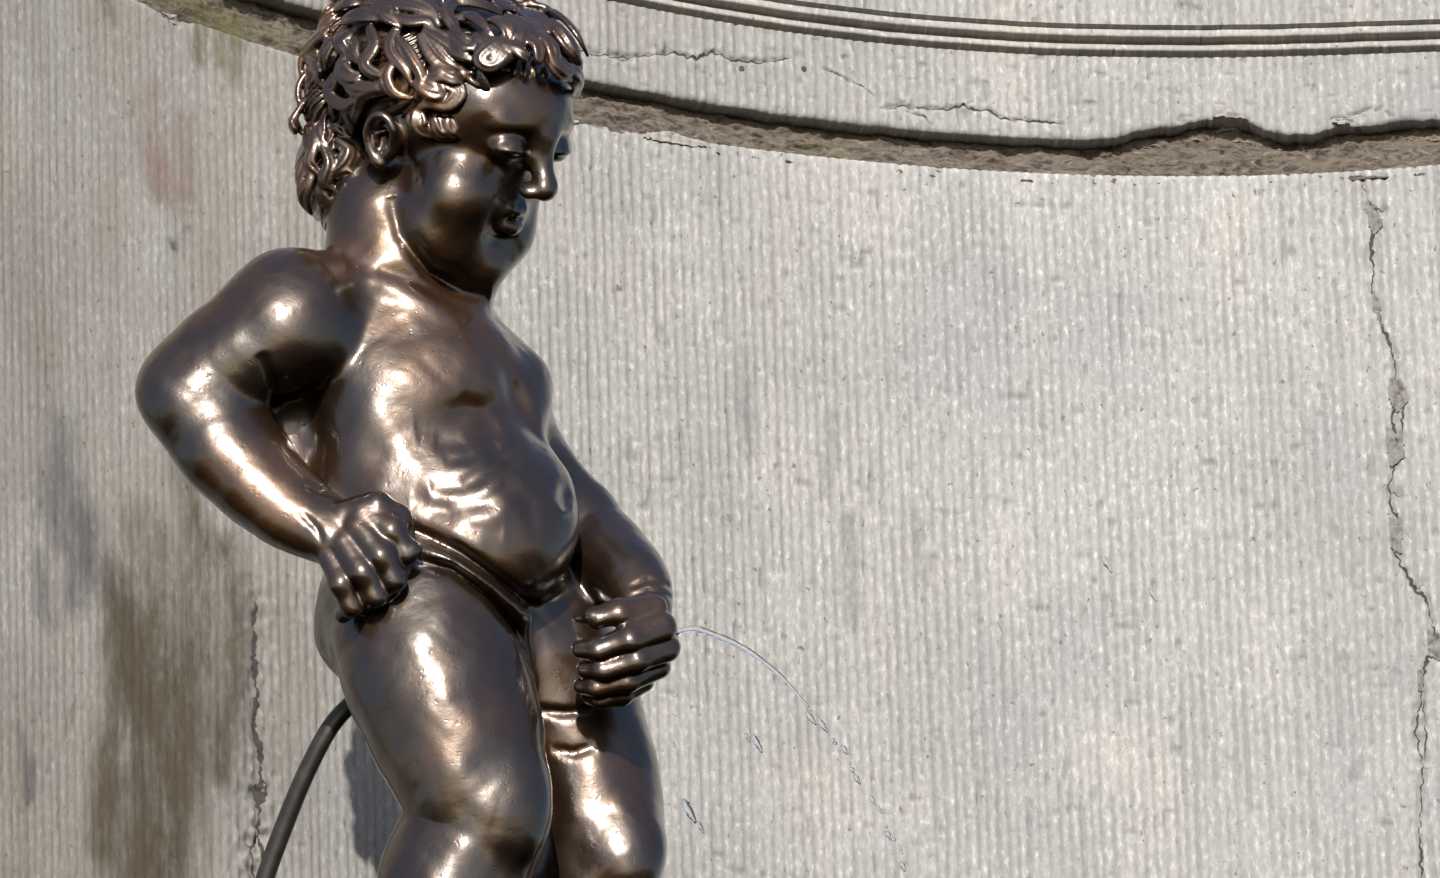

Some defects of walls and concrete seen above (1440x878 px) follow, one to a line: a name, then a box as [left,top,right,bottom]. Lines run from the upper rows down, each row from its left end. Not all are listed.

spalling [643,131,707,147]
crack [580,49,786,64]
crack [829,71,1059,124]
spalling [1130,107,1255,151]
spalling [1276,118,1362,152]
water stain [187,488,228,578]
crack [1362,184,1440,878]
water stain [215,581,243,780]
water stain [107,576,197,878]
water stain [94,729,116,853]